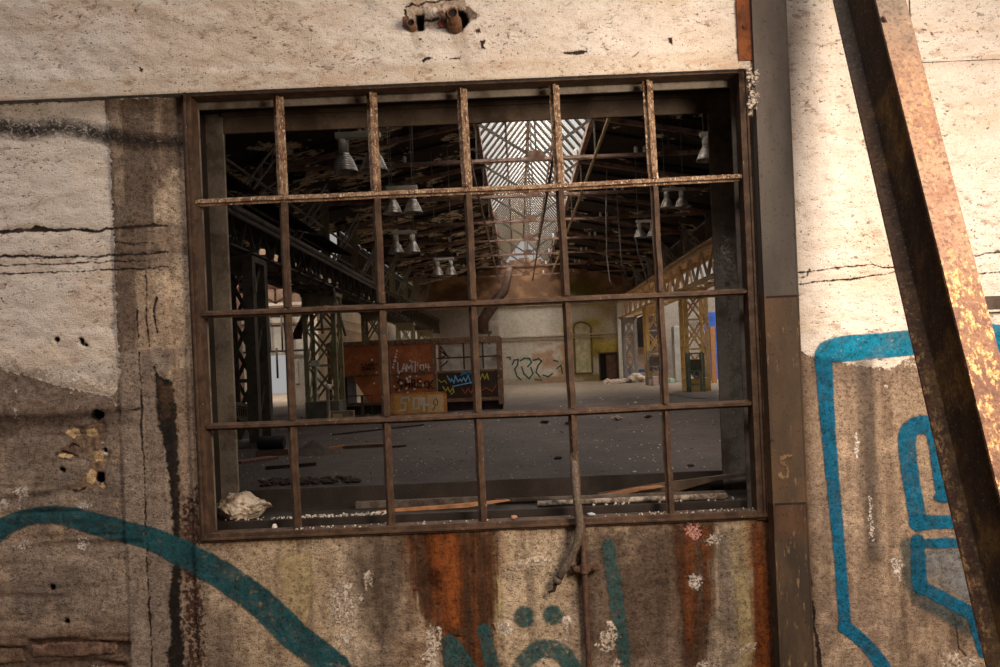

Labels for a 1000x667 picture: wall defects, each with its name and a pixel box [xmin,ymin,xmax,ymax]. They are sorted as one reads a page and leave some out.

spalling [404,0,485,49]
crack [798,263,894,285]
peeling [2,354,120,409]
spalling [54,410,110,492]
crack [0,223,169,667]
water stain [153,365,181,540]
spalling [0,637,131,667]
water stain [165,555,185,667]
corrosion [185,563,207,667]
corrosion [408,532,498,667]
corrosion [673,522,713,667]
corrosion [752,520,775,667]